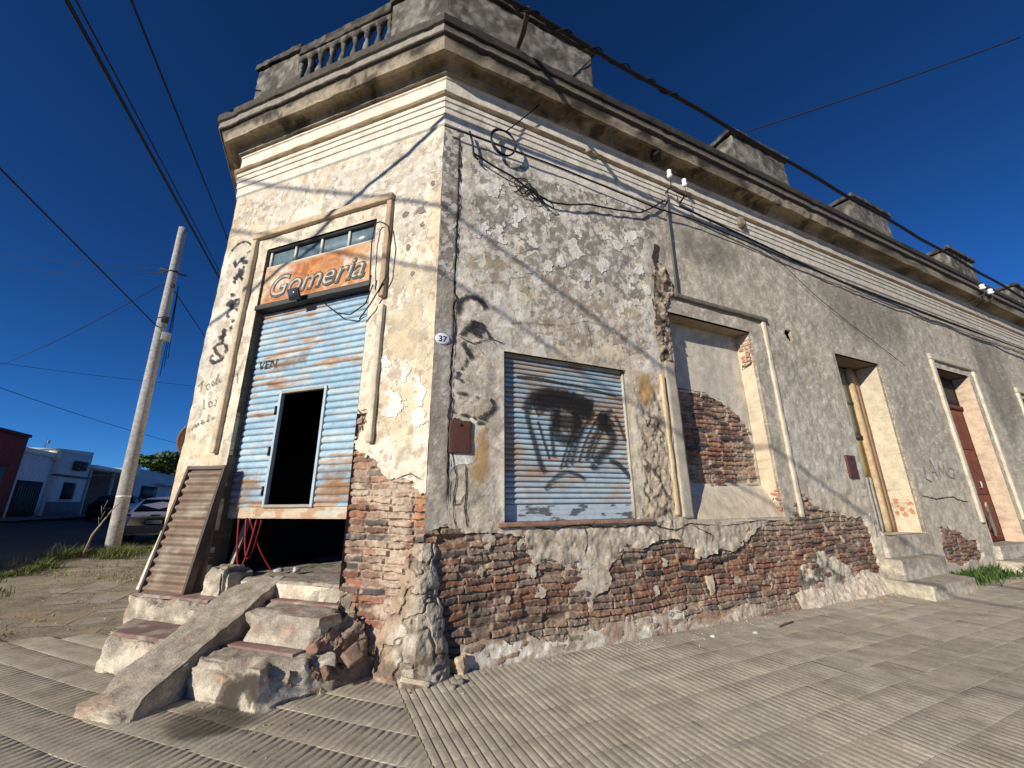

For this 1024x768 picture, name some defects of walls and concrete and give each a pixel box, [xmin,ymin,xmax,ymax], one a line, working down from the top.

peeling [320,128,674,428]
flaking render [339,409,880,675]
flaking render [678,388,761,486]
flaking render [939,524,981,566]